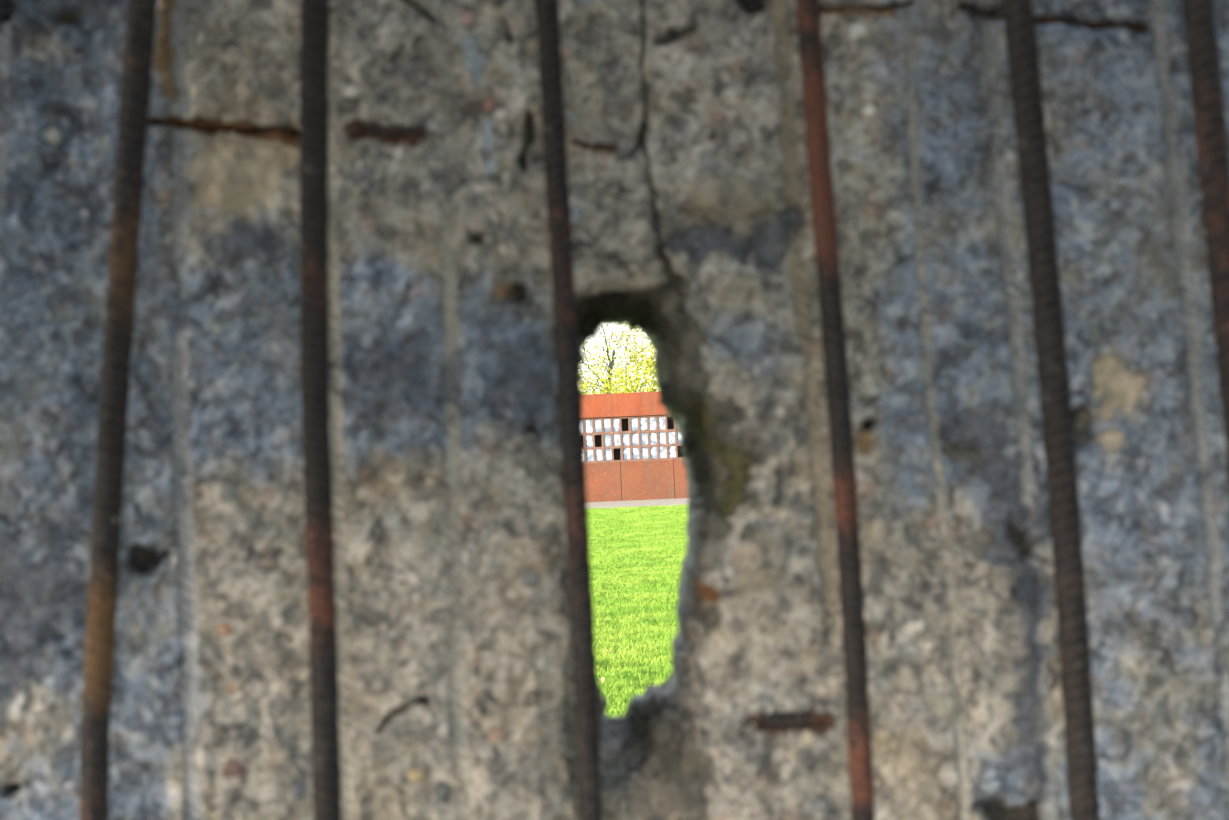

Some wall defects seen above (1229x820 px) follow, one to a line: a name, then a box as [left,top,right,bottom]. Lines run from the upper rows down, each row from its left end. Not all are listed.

corrosion [344,119,427,148]
crack [624,0,687,307]
spalling [79,0,168,820]
spalling [654,0,875,820]
corrosion [750,708,835,734]